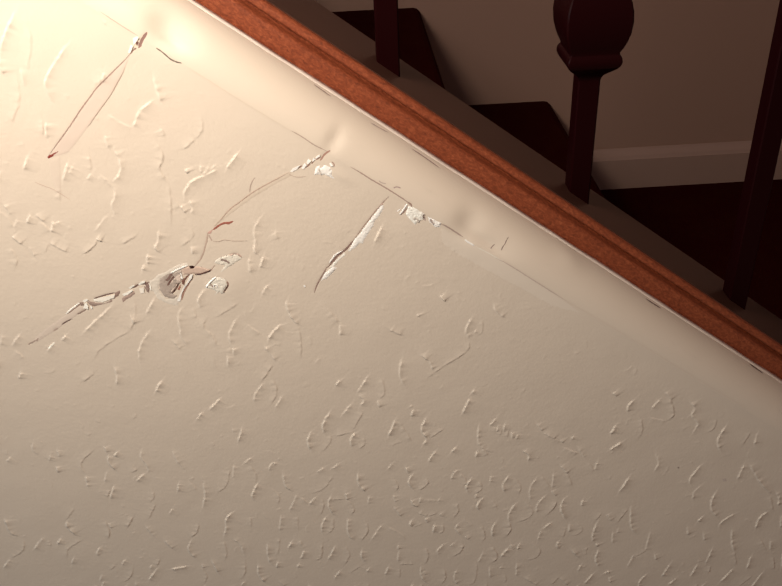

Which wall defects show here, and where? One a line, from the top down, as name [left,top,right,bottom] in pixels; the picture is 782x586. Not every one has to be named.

crack [49,12,463,300]
crack [53,293,113,331]
peeling [79,281,151,309]